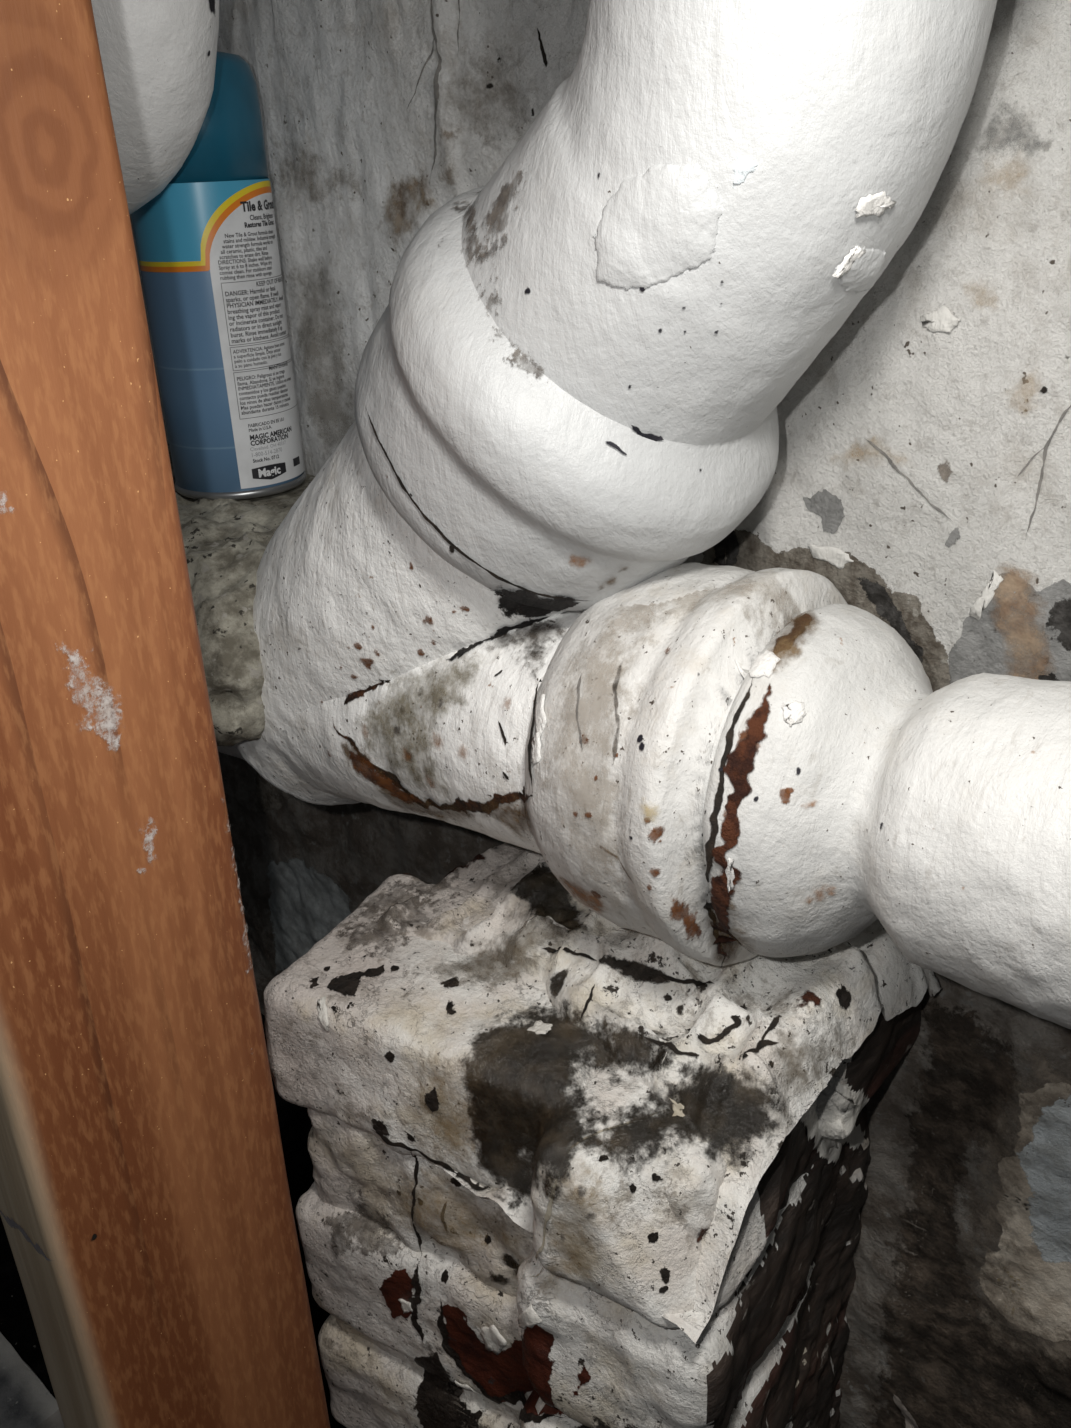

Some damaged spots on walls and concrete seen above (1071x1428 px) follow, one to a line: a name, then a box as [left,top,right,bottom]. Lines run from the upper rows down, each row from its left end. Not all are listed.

crack [407,0,460,169]
rust [340,643,391,705]
rust [328,721,533,833]
leakage [365,585,580,787]
crack [367,412,586,601]
rust [670,612,817,967]
spalling [701,489,1071,692]
crack [374,1131,503,1256]
leakage [420,970,821,1217]
peeling [801,1076,869,1166]
leakage [869,1001,1071,1428]
peeling [973,1049,1071,1368]